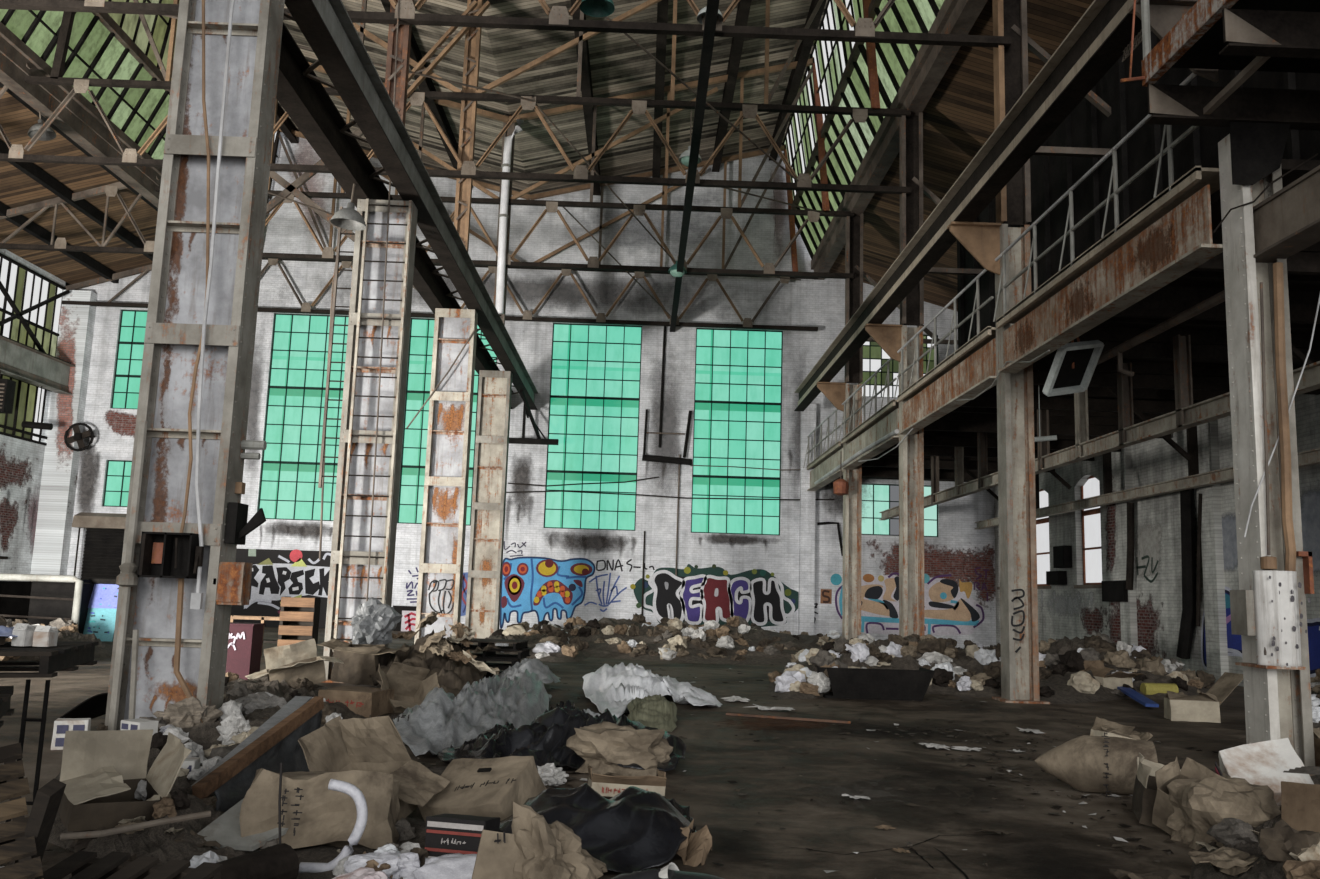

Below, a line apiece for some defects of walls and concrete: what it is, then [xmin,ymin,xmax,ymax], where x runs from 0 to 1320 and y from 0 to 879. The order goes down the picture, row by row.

corrosion [164,155,211,323]
corrosion [1134,224,1176,275]
corrosion [1064,281,1094,324]
corrosion [1015,319,1035,353]
corrosion [151,344,186,522]
corrosion [437,403,464,431]
flaking render [0,450,32,552]
corrosion [432,487,459,523]
flaking render [867,539,899,576]
flaking render [924,542,996,607]
crack [785,835,969,879]